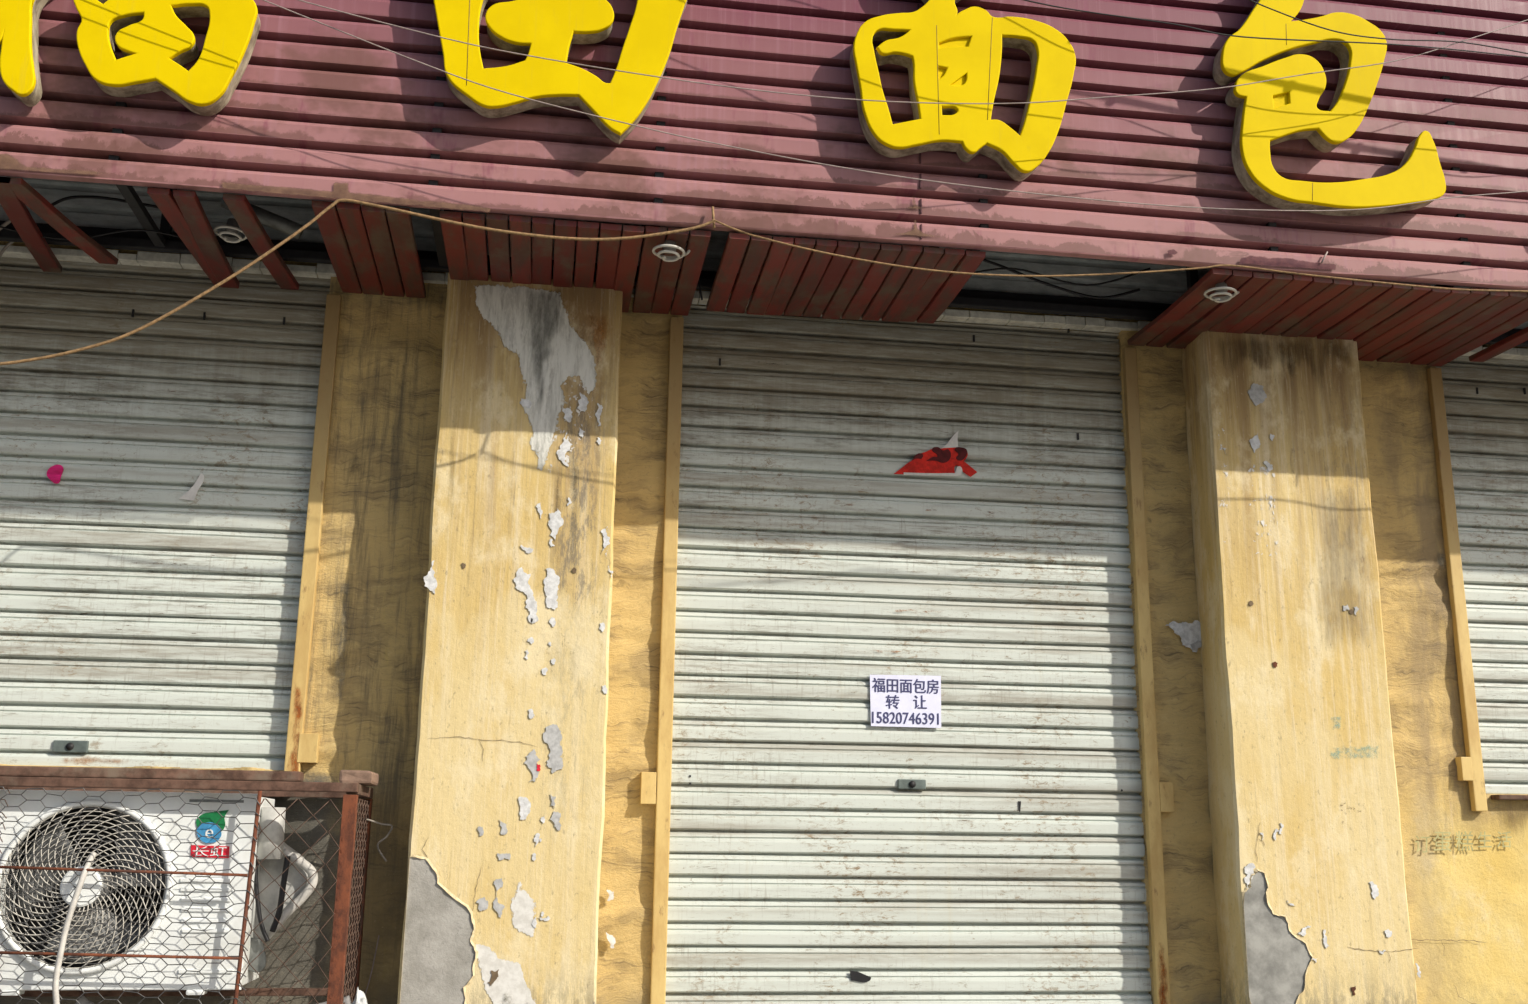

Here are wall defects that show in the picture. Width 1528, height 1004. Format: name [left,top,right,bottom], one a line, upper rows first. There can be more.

peeling [475,284,603,472]
peeling [601,526,613,578]
peeling [1165,620,1202,652]
peeling [477,709,563,861]
spalling [399,855,550,1004]
spalling [1242,863,1329,1004]